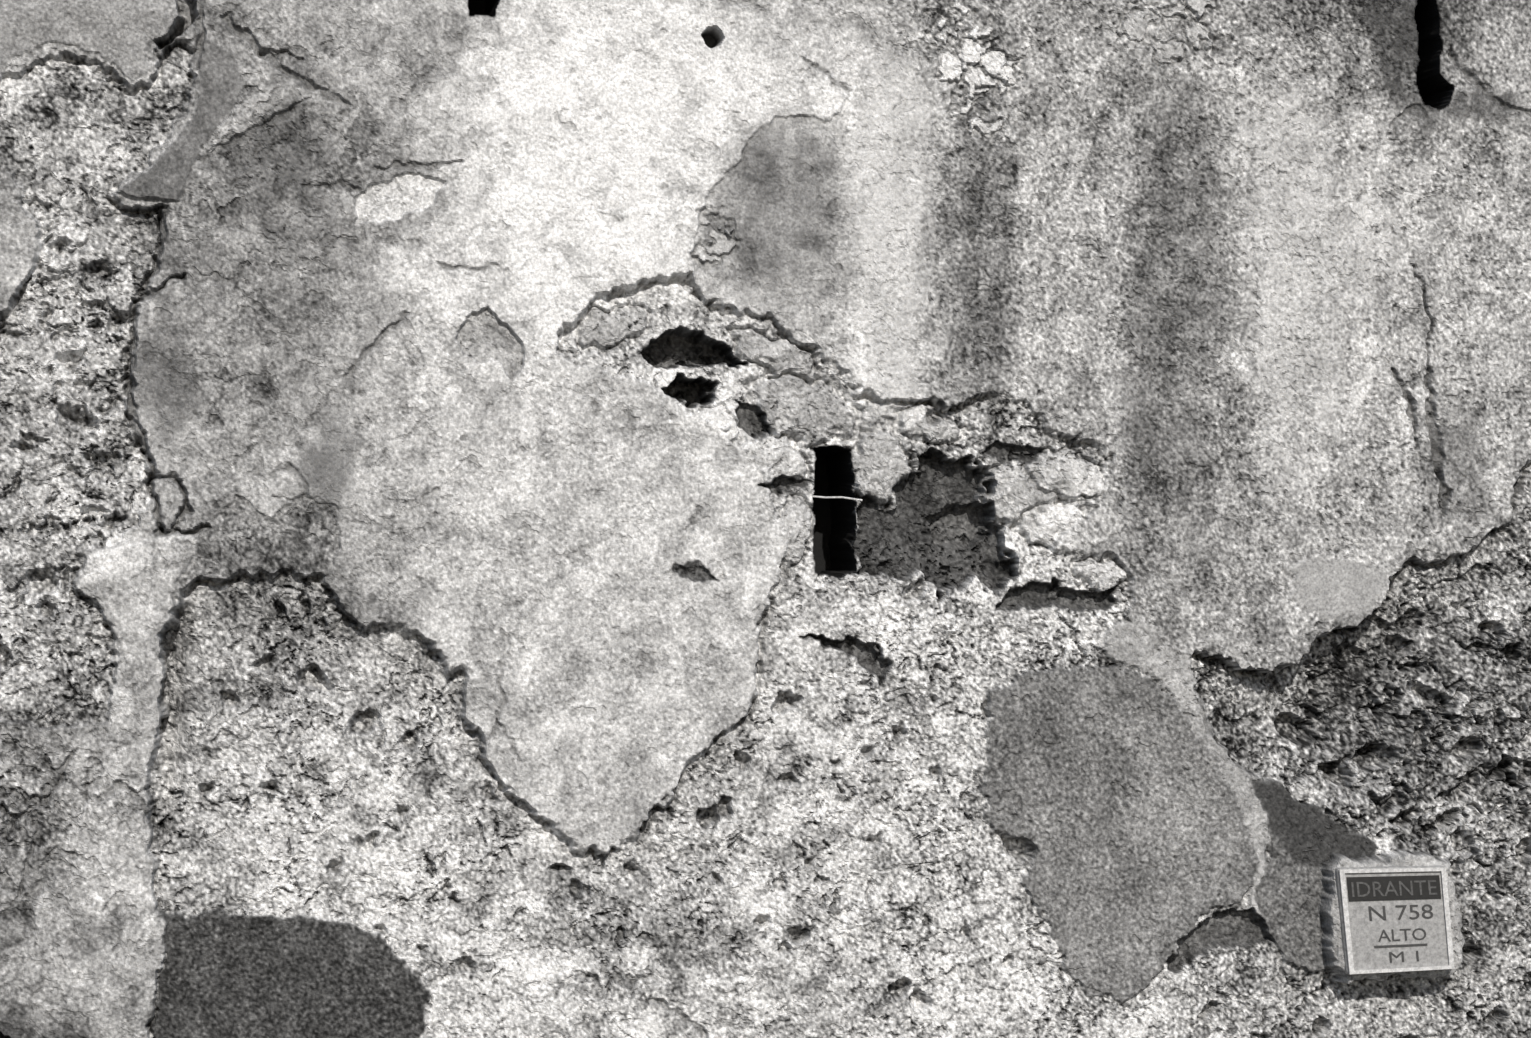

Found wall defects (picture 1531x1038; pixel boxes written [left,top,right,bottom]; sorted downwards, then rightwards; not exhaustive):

crack [192,0,353,167]
peeling [921,0,1028,155]
spalling [0,0,245,731]
crack [1391,264,1454,518]
spalling [145,206,1531,1038]